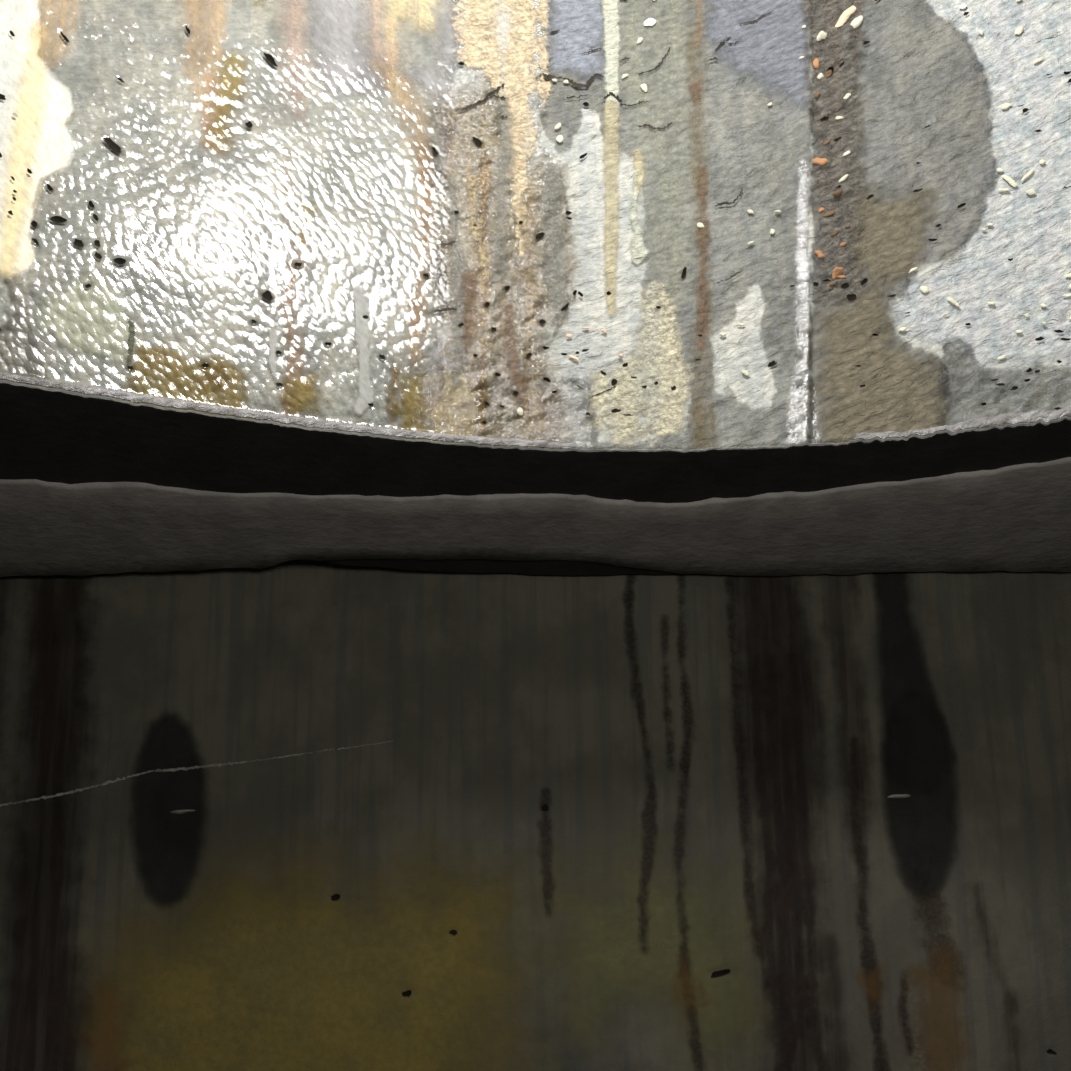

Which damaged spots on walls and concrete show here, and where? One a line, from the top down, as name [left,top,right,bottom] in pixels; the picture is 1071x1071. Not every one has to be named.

damp [702,0,810,107]
damp [888,0,1071,364]
damp [127,318,136,366]
damp [0,576,87,1071]
crack [0,740,394,807]
damp [638,775,656,950]
damp [664,679,692,870]
damp [728,575,826,1071]